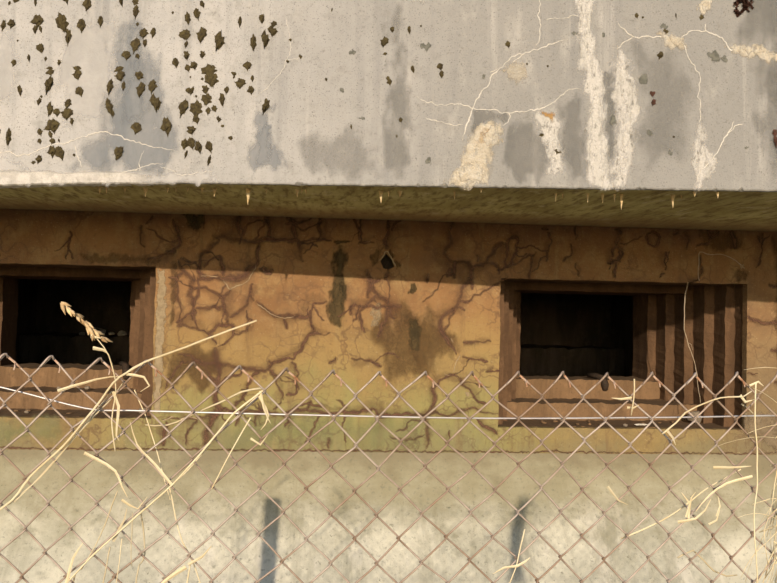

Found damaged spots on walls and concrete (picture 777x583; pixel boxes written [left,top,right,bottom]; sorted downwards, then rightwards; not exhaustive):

damp [61,22,215,186]
damp [249,114,280,169]
damp [449,110,506,190]
crack [416,0,581,140]
damp [575,0,640,189]
crack [618,23,733,127]
crack [696,120,742,183]
damp [326,240,350,327]
spalling [379,251,396,270]
damp [168,345,217,391]
crack [1,215,777,455]
damp [372,306,453,376]